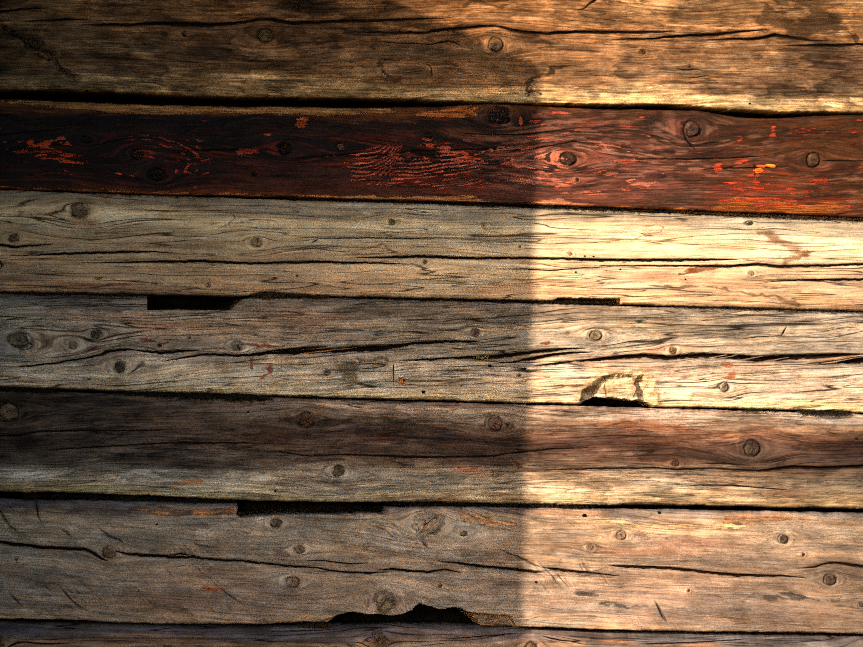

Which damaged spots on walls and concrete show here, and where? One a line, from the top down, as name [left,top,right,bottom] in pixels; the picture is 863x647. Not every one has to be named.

crack [0,0,863,74]
peeling [7,99,395,130]
peeling [415,105,478,118]
peeling [0,131,274,197]
peeling [298,111,667,207]
peeling [706,159,857,215]
crack [0,237,863,282]
crack [11,328,863,397]
crack [0,541,863,578]
spalling [456,607,515,626]